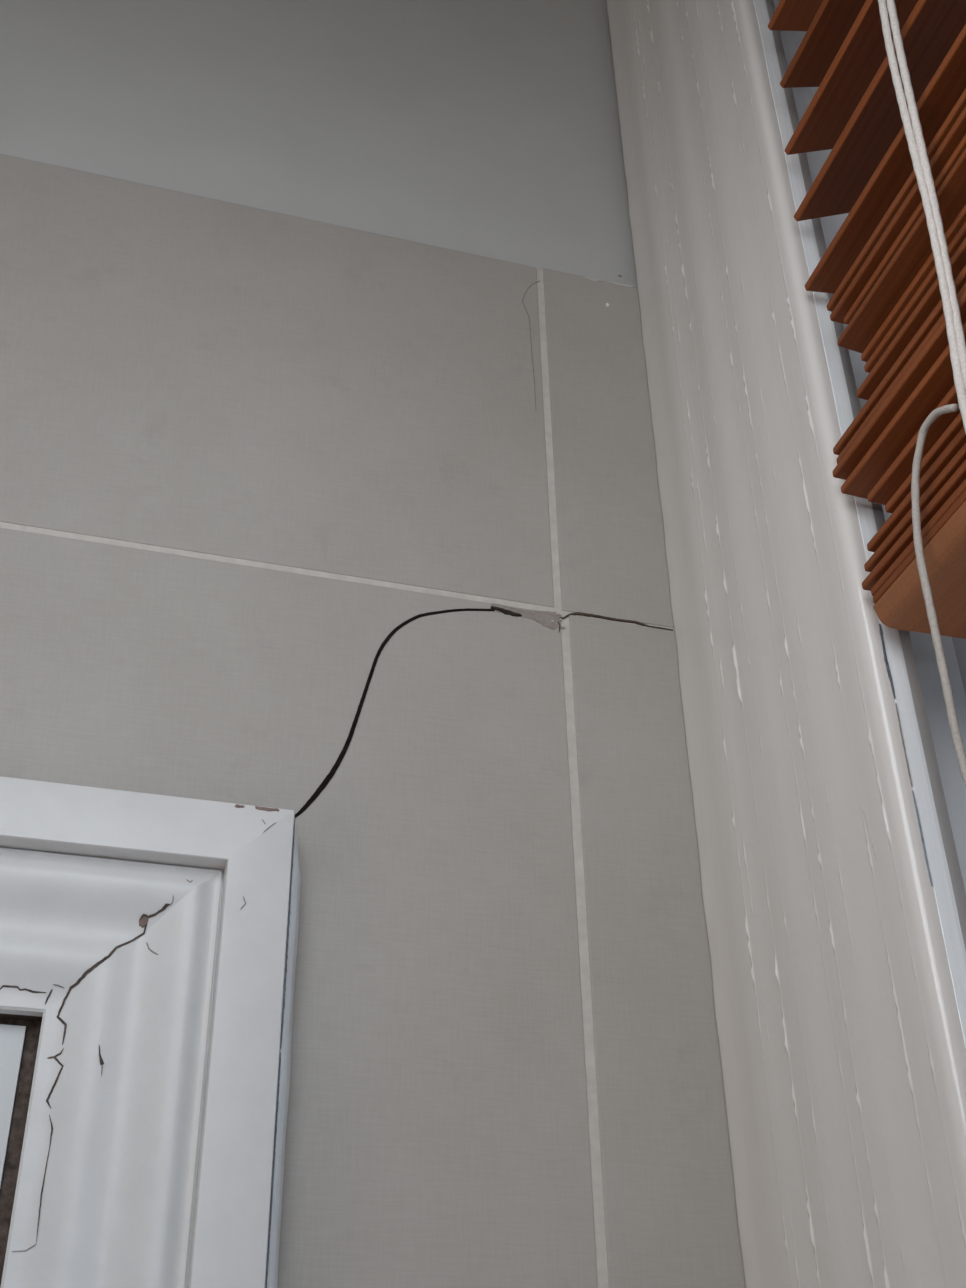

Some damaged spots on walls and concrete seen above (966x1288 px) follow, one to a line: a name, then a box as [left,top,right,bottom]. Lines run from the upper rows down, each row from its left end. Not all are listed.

crack [558,612,673,632]
crack [0,894,174,1252]
crack [266,608,495,1288]